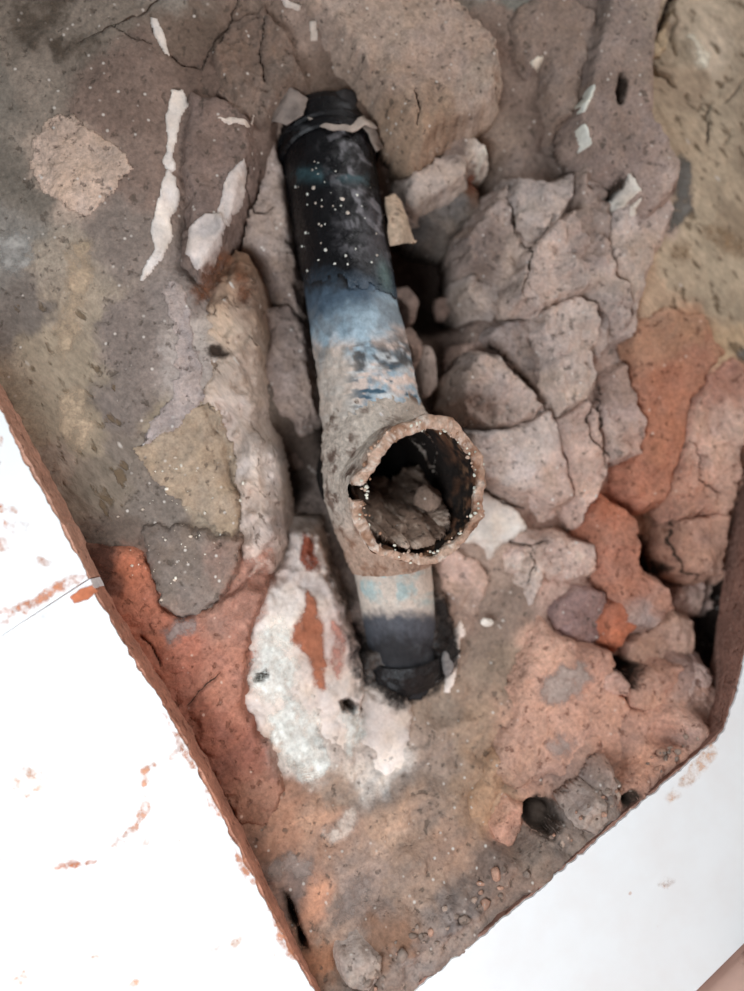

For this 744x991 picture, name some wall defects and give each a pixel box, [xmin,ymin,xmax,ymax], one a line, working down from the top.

crack [657,0,673,40]
peeling [140,89,189,281]
peeling [185,159,247,274]
crack [511,206,553,288]
crack [488,344,534,392]
spalling [608,307,744,523]
rust [300,533,319,571]
spalling [70,542,285,826]
water stain [221,549,330,792]
rust [291,591,346,689]
water stain [347,594,459,709]
water stain [329,808,356,843]